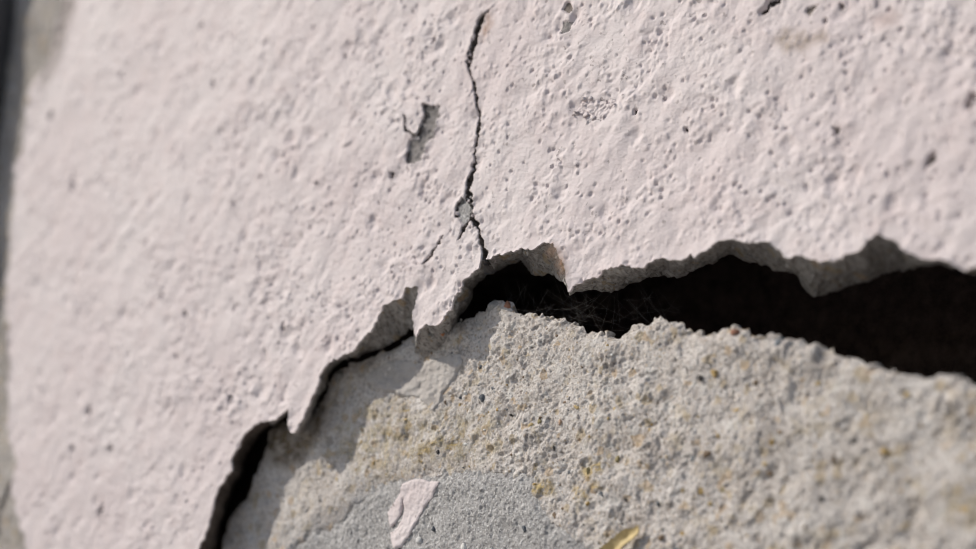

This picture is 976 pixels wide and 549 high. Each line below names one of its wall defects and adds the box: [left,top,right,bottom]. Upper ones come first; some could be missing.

crack [423,10,976,386]
crack [215,328,414,549]
flaking render [200,234,976,549]